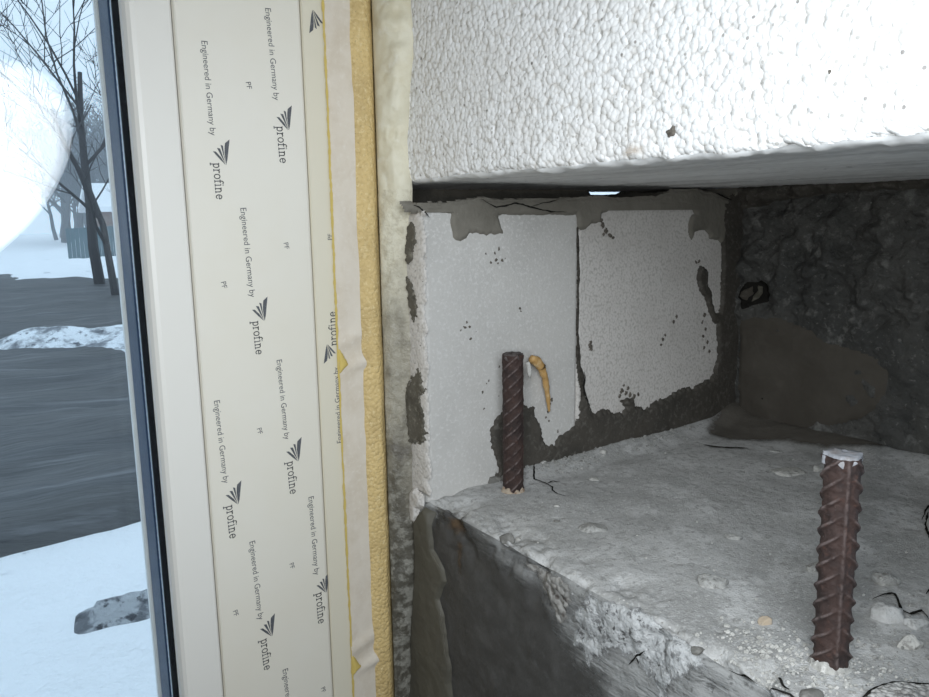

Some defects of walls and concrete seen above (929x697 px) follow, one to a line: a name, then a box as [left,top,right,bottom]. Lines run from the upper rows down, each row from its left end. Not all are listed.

crack [921,505,929,537]
spalling [770,447,865,676]
crack [873,589,929,619]
spalling [526,563,705,697]
spalling [870,602,929,651]
spalling [799,688,824,697]
crack [862,681,929,697]